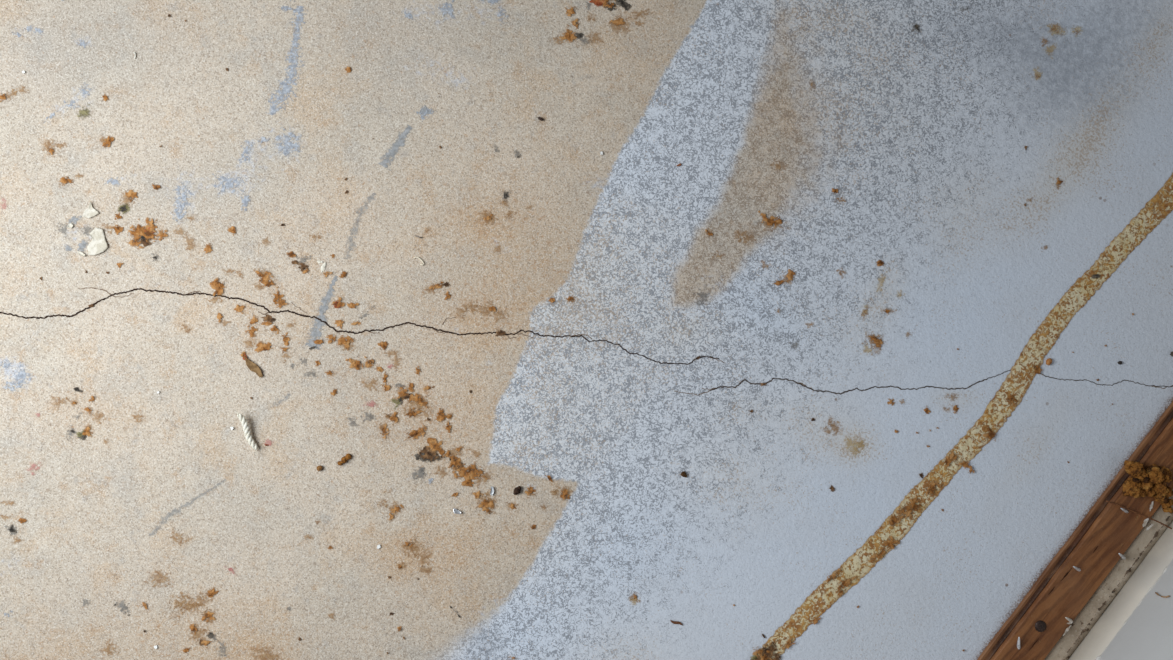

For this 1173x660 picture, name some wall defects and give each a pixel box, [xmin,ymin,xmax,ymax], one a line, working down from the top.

peeling [67,201,108,257]
rust [758,211,786,229]
rust [773,269,796,286]
crack [0,287,1011,396]
rust [862,334,883,355]
crack [1039,373,1173,389]
rust [940,451,975,474]
rust [870,473,942,563]
rust [977,397,1173,658]
rust [826,566,858,597]